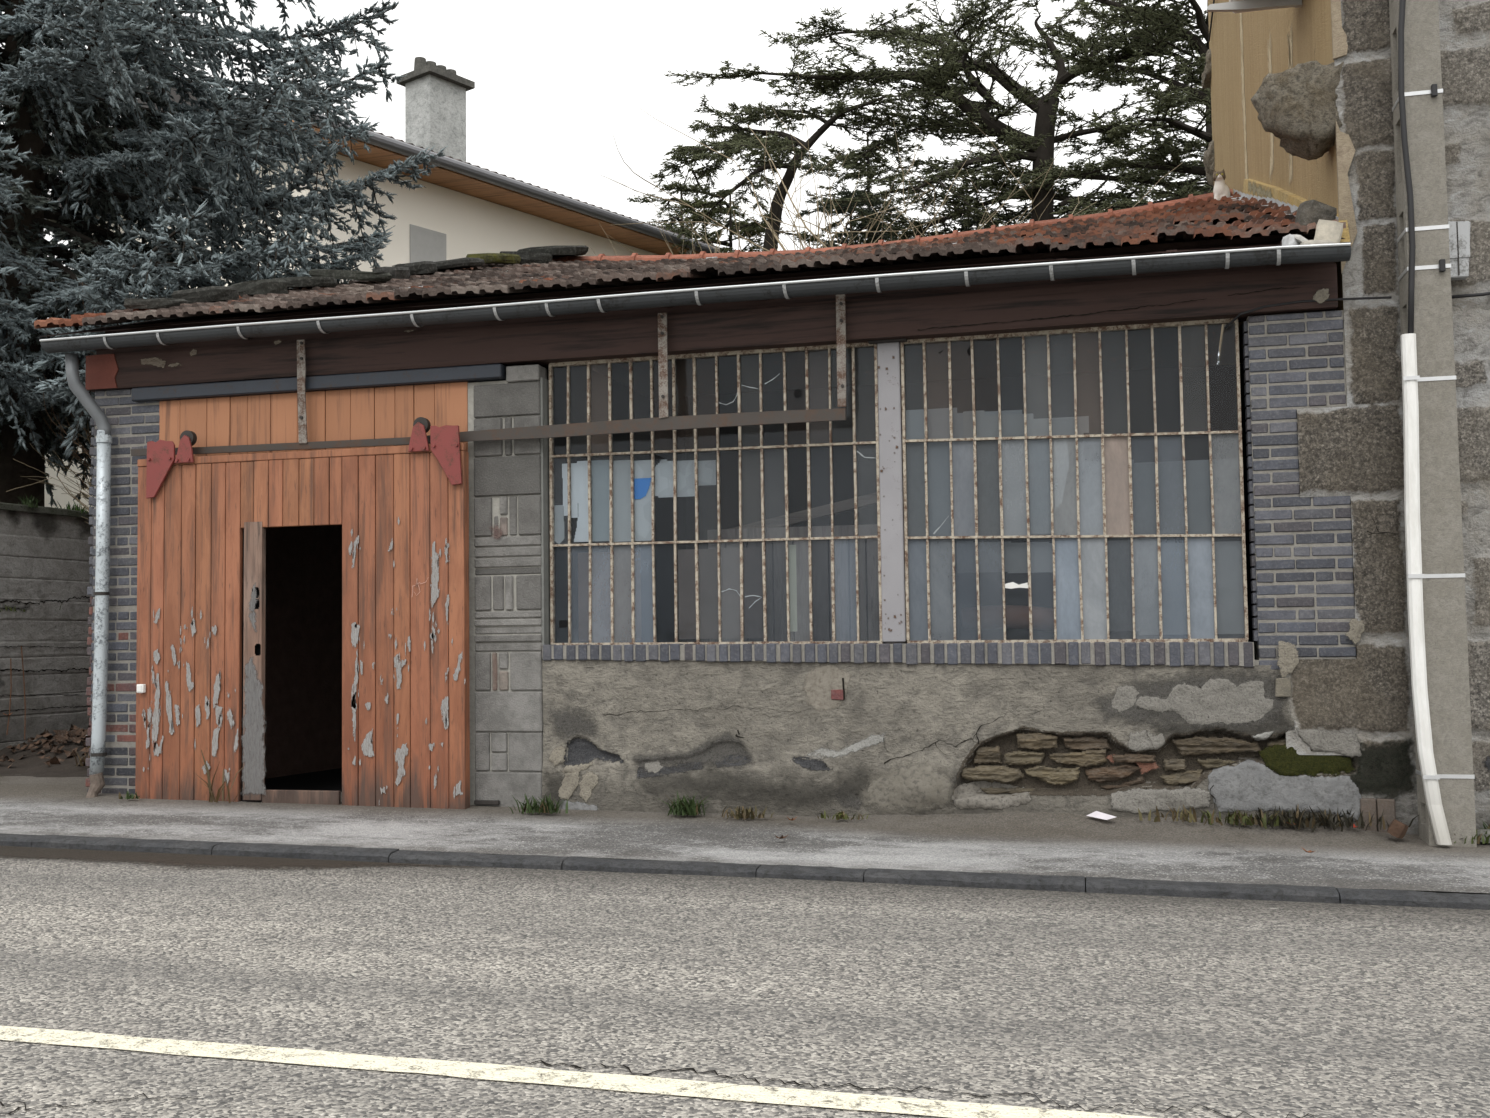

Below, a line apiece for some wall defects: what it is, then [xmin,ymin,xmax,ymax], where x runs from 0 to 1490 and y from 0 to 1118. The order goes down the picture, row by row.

peeling [348,529,361,567]
crack [0,596,90,610]
crack [0,646,89,712]
peeling [142,606,266,795]
peeling [348,538,465,798]
spalling [549,711,752,810]
peeling [793,734,885,771]
spalling [952,641,1362,810]
crack [530,1060,1320,1118]